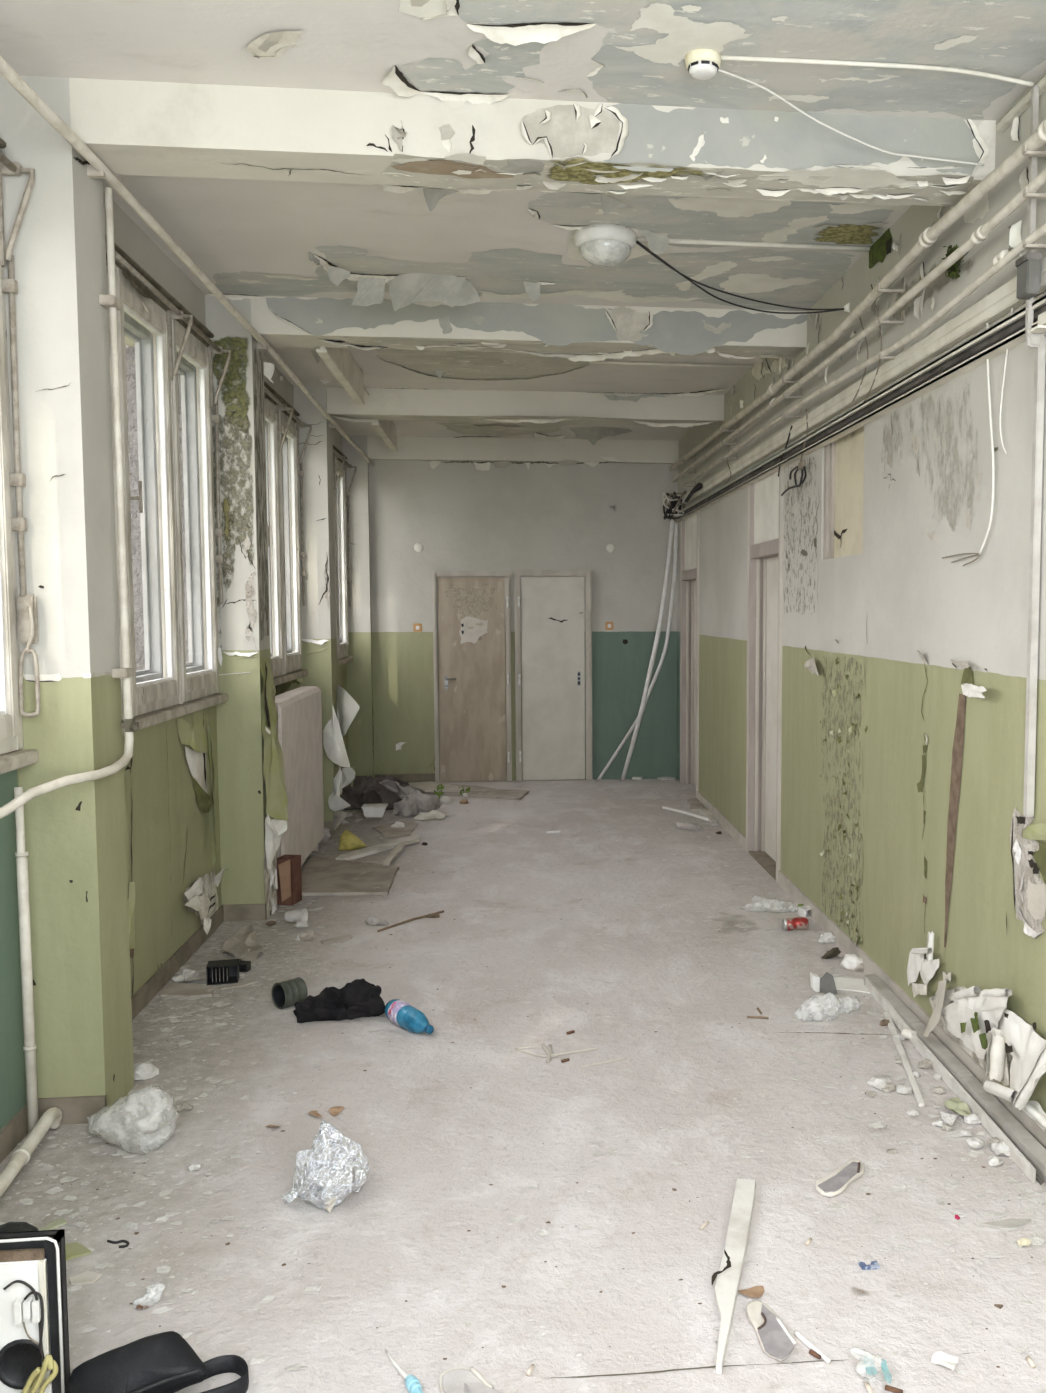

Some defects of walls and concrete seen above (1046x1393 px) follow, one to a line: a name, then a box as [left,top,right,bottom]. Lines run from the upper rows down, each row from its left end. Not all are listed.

peeling [209,0,1046,471]
mould [813,222,892,269]
mould [212,348,269,640]
peeling [176,709,224,934]
peeling [218,571,303,919]
peeling [302,639,329,655]
peeling [323,685,359,830]
spalling [1006,806,1046,939]
peeling [907,931,1046,1132]